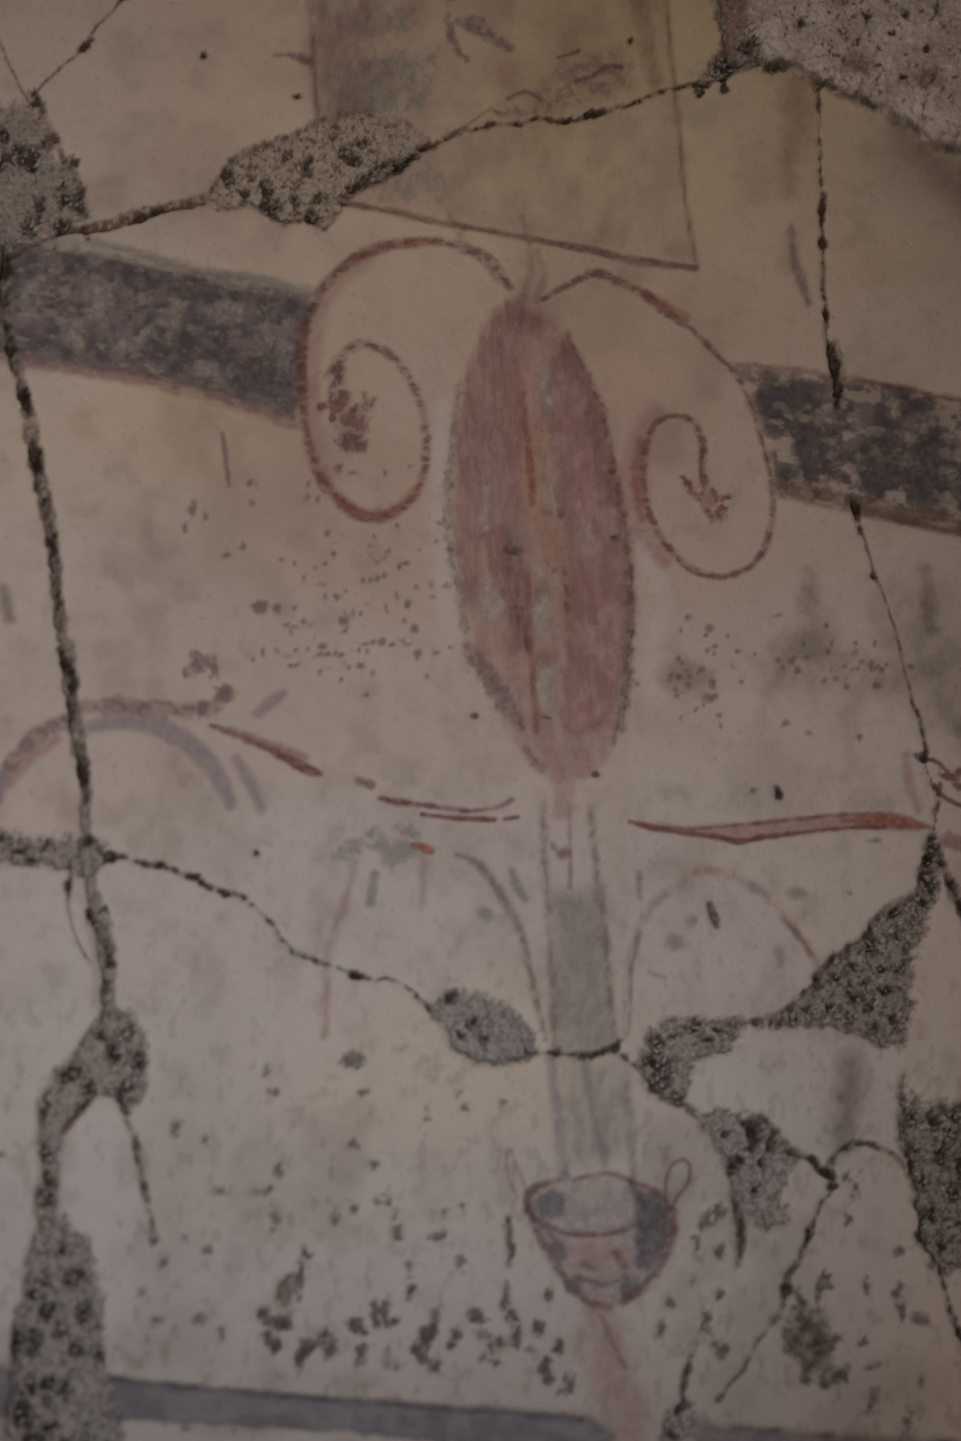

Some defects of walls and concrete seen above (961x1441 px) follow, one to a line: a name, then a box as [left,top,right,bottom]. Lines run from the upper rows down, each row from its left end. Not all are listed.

flaking render [0,90,88,254]
flaking render [203,109,430,229]
crack [418,71,733,152]
crack [817,97,843,467]
crack [0,197,430,1037]
crack [908,684,961,916]
flaking render [430,991,538,1066]
crack [525,1039,637,1067]
flaking render [639,835,942,1259]
flaking render [5,1010,148,1441]
crack [681,1141,893,1403]
flaking render [895,1076,961,1274]